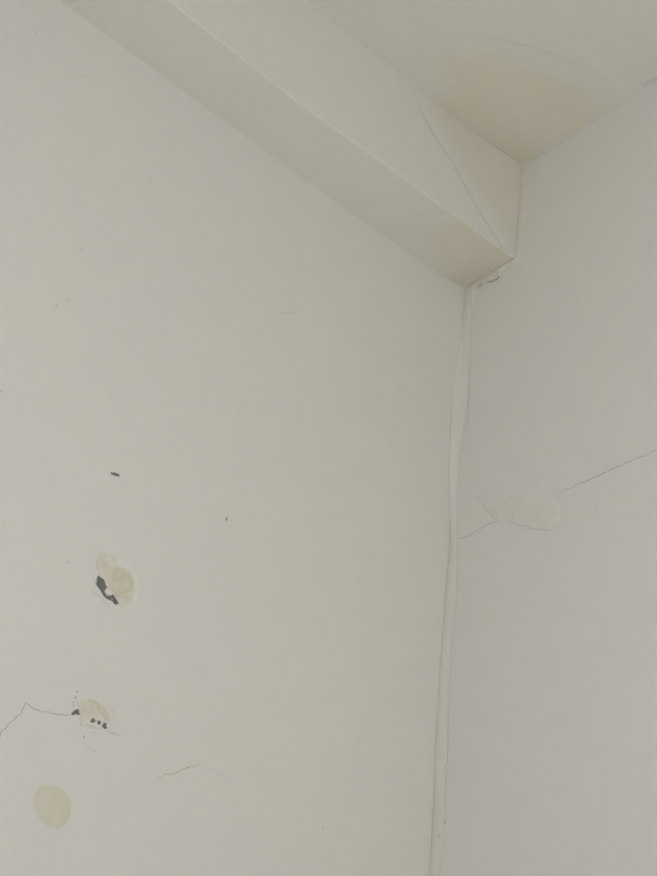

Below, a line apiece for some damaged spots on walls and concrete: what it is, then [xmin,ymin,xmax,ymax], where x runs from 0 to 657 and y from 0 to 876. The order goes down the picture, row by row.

flaking render [88,552,139,609]
crack [0,702,70,738]
flaking render [71,691,121,753]